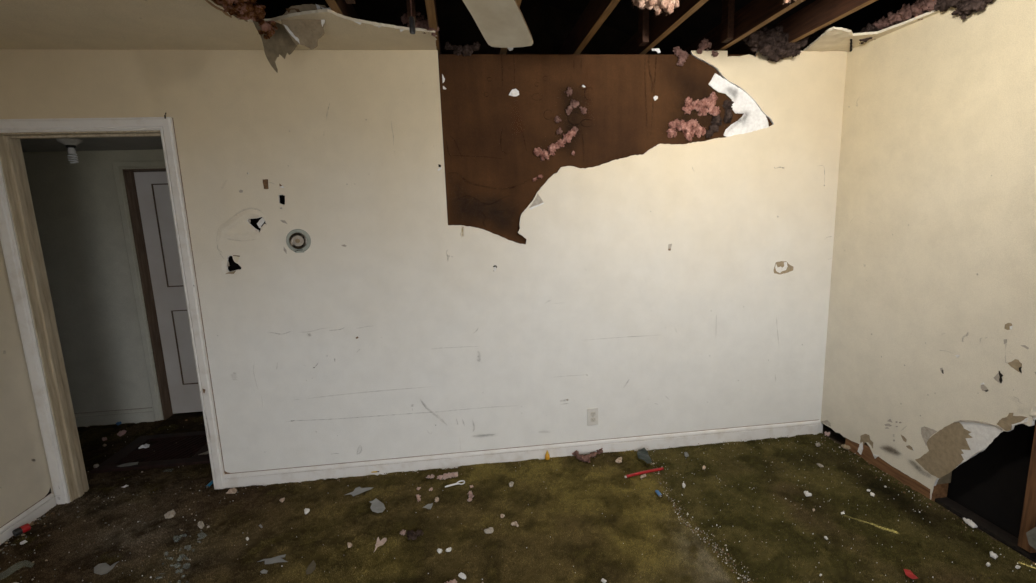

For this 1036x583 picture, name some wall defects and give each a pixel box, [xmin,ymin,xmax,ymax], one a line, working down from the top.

peeling [205,0,331,72]
peeling [803,27,852,52]
peeling [708,73,769,137]
peeling [262,179,287,224]
peeling [529,194,544,210]
spalling [247,217,266,232]
spalling [221,255,241,274]
spalling [774,261,794,274]
peeling [980,359,1022,392]
spalling [858,434,879,459]
peeling [901,413,1028,478]